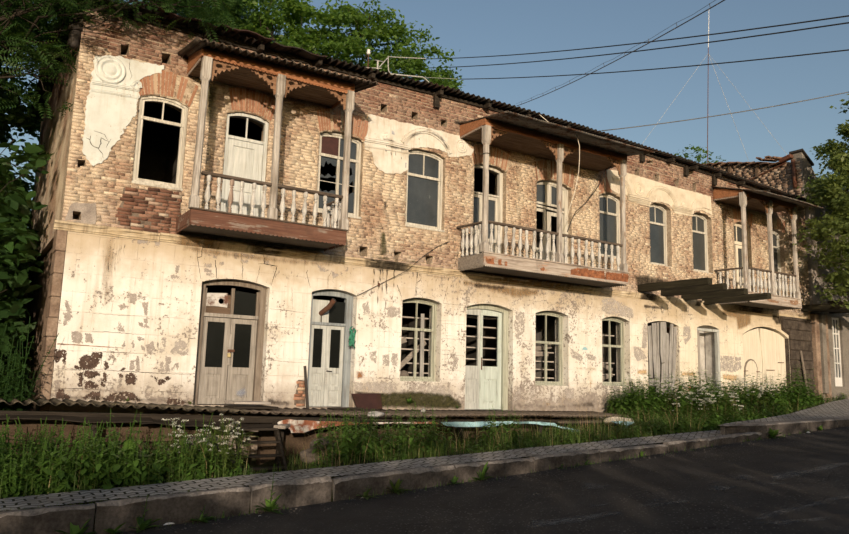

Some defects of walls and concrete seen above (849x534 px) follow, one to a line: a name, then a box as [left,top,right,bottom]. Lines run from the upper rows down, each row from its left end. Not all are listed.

peeling [382,307,401,330]
peeling [514,310,525,339]
spalling [54,293,188,402]
peeling [370,351,398,366]
peeling [720,356,742,373]
peeling [353,381,397,394]